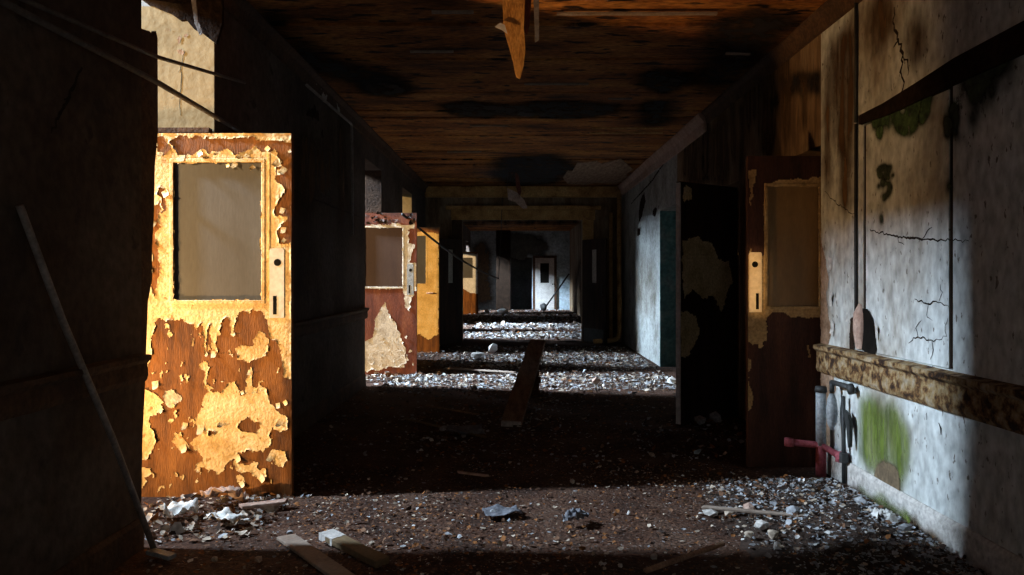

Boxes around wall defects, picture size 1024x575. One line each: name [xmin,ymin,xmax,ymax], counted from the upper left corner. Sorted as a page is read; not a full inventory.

crack [893,7,909,91]
leakage [871,95,933,140]
leakage [876,163,894,224]
crack [826,192,969,245]
peeling [142,133,291,492]
peeling [370,223,439,340]
peeling [681,236,733,358]
crack [909,289,948,359]
leakage [863,407,900,491]